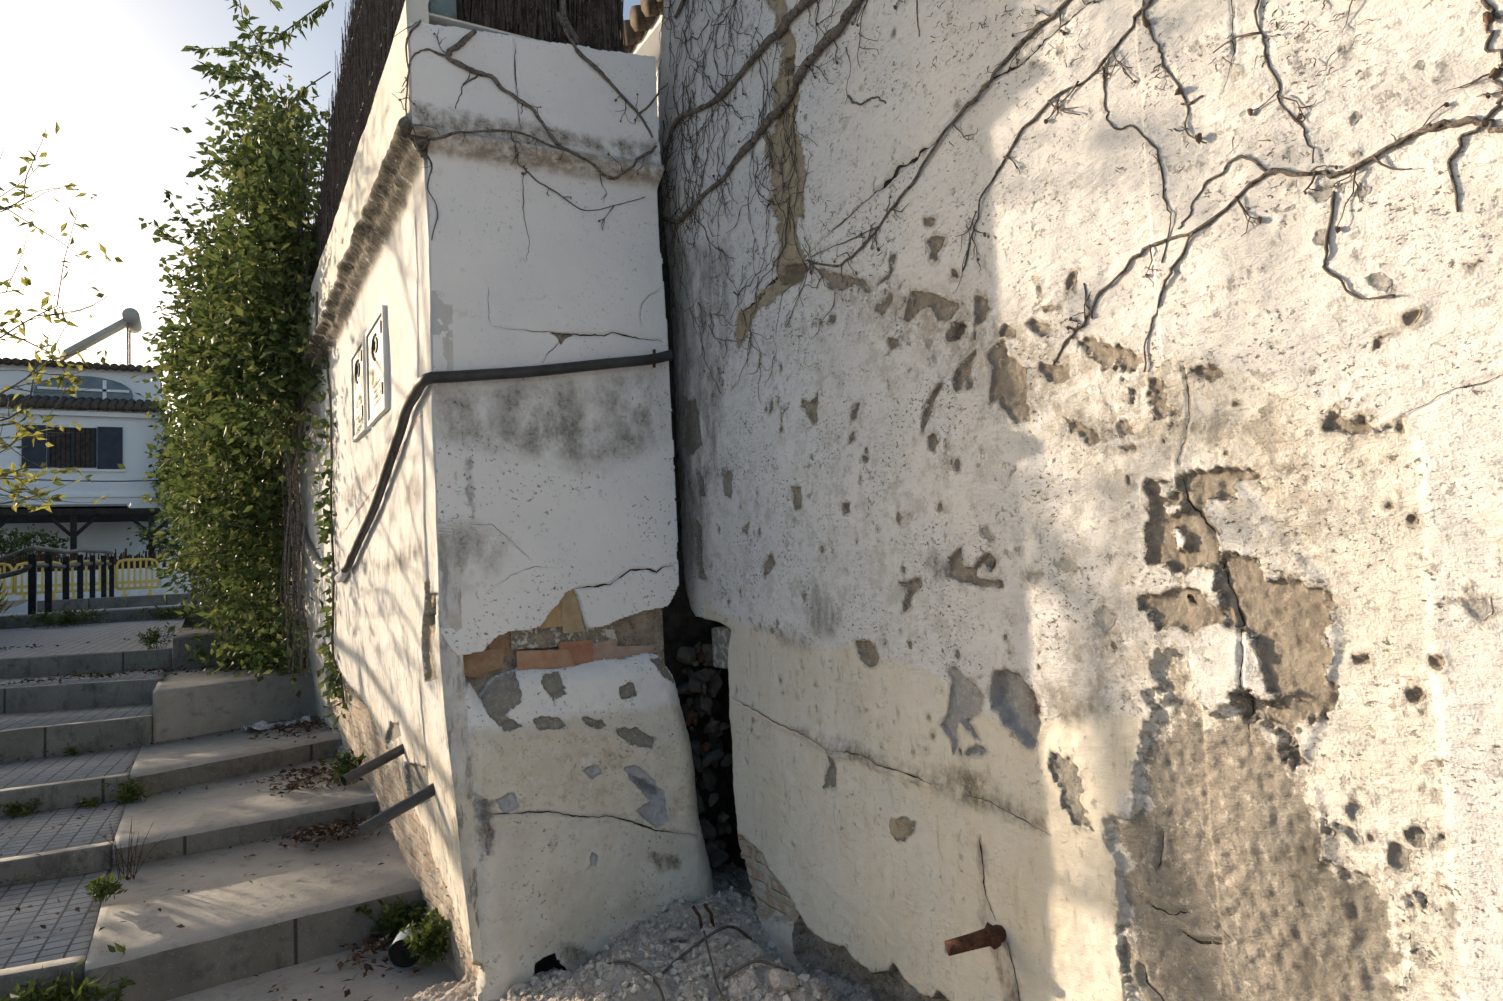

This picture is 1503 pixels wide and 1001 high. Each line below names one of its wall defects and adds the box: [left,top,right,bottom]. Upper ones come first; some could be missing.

peeling [726,0,1077,482]
peeling [1063,336,1223,451]
crack [459,183,930,874]
crack [1177,365,1254,737]
flaking render [324,638,484,997]
peeling [473,792,519,856]
flaking render [421,581,674,749]
peeling [624,765,669,829]
crack [969,795,1051,836]
peeling [913,450,1445,1001]
spalling [738,834,950,1001]
rust [985,922,1002,950]